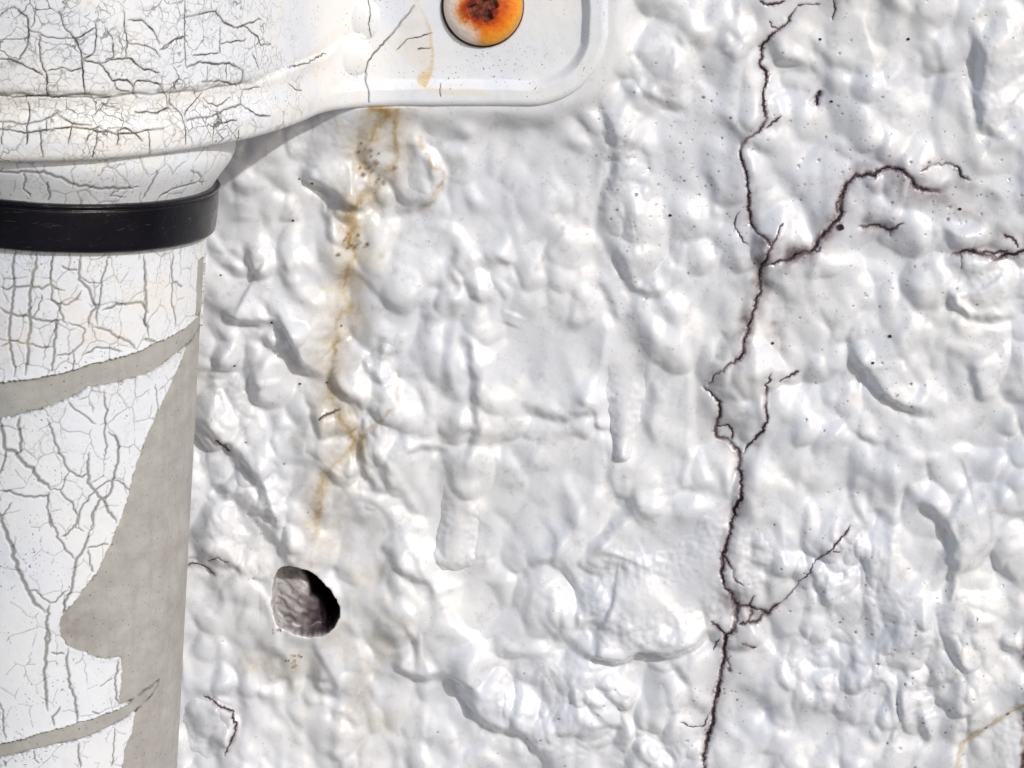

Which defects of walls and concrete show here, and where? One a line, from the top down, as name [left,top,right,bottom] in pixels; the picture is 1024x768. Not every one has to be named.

crack [0,6,267,157]
rust [368,106,395,123]
crack [365,0,430,101]
rust [441,0,524,48]
crack [951,234,1024,267]
crack [681,0,971,768]
spalling [270,566,340,638]
crack [204,696,238,753]